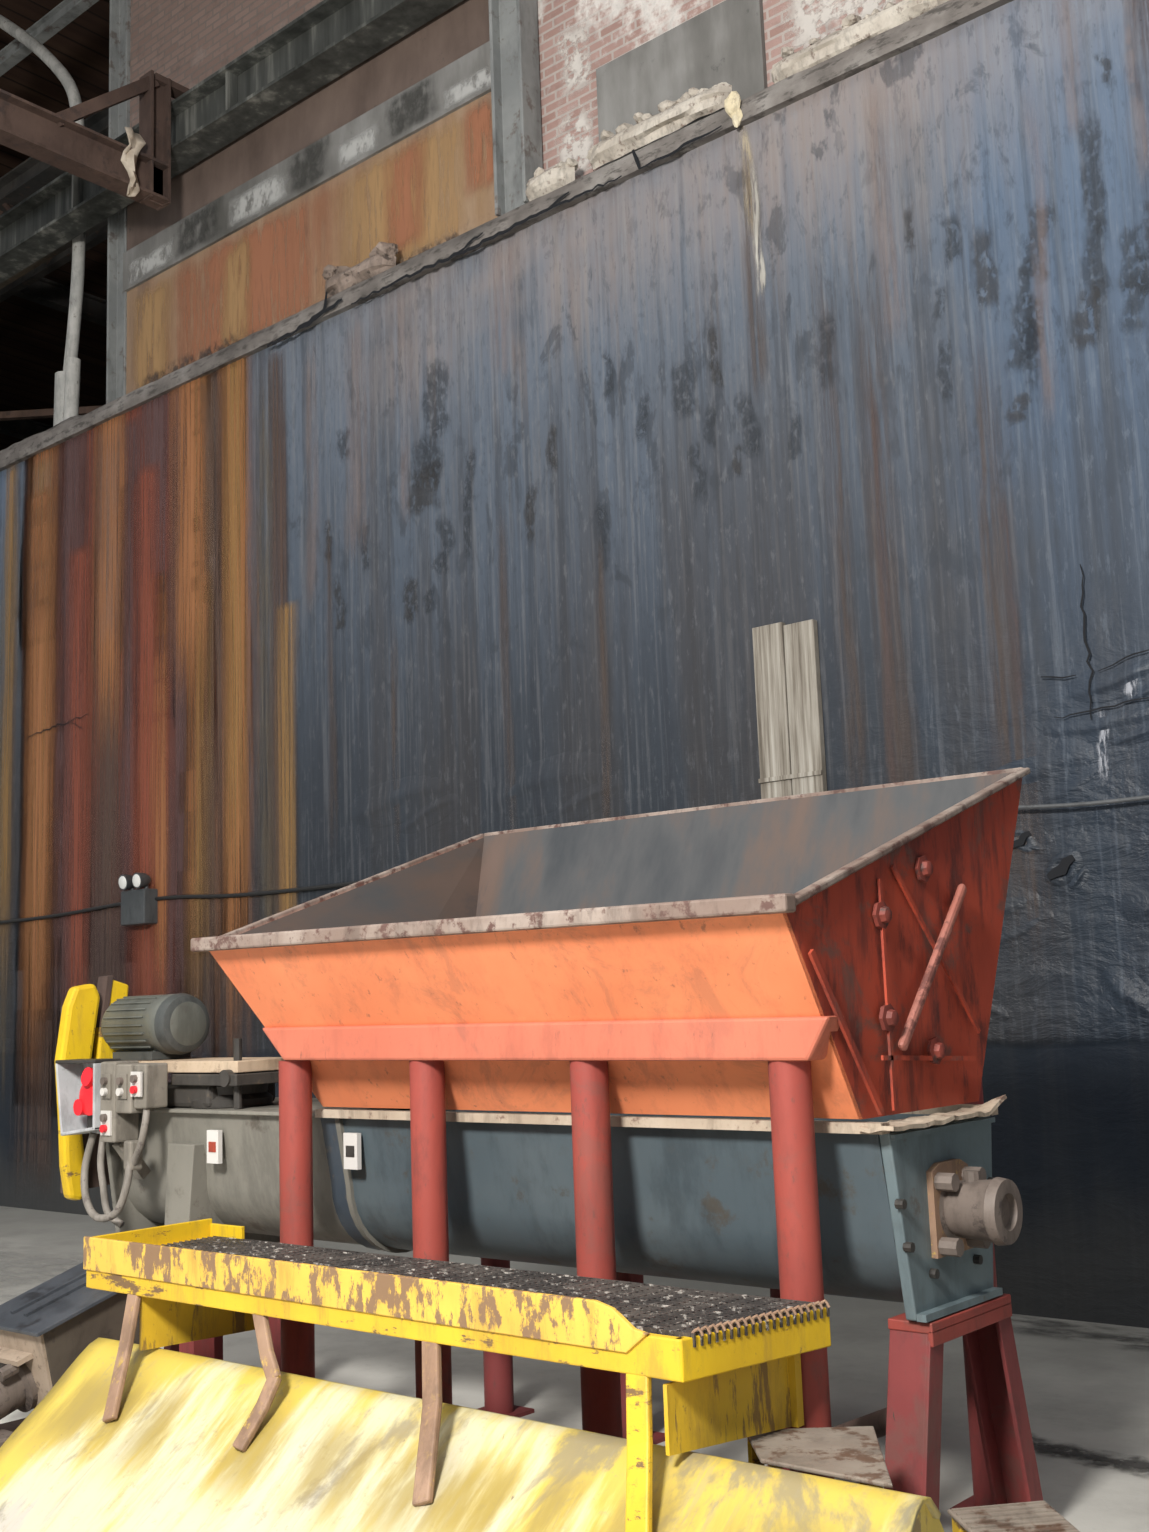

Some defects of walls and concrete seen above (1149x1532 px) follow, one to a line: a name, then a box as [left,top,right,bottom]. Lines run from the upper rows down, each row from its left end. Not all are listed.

water stain [134,208,215,277]
water stain [234,143,322,220]
water stain [340,129,374,161]
water stain [448,70,491,103]
peeling [557,27,590,94]
spalling [526,82,732,202]
efflorescence [724,91,765,288]
rust [2,470,14,886]
rust [272,356,293,912]
crack [1041,564,1149,720]
rust [24,358,246,1166]
crack [1032,1437,1149,1472]